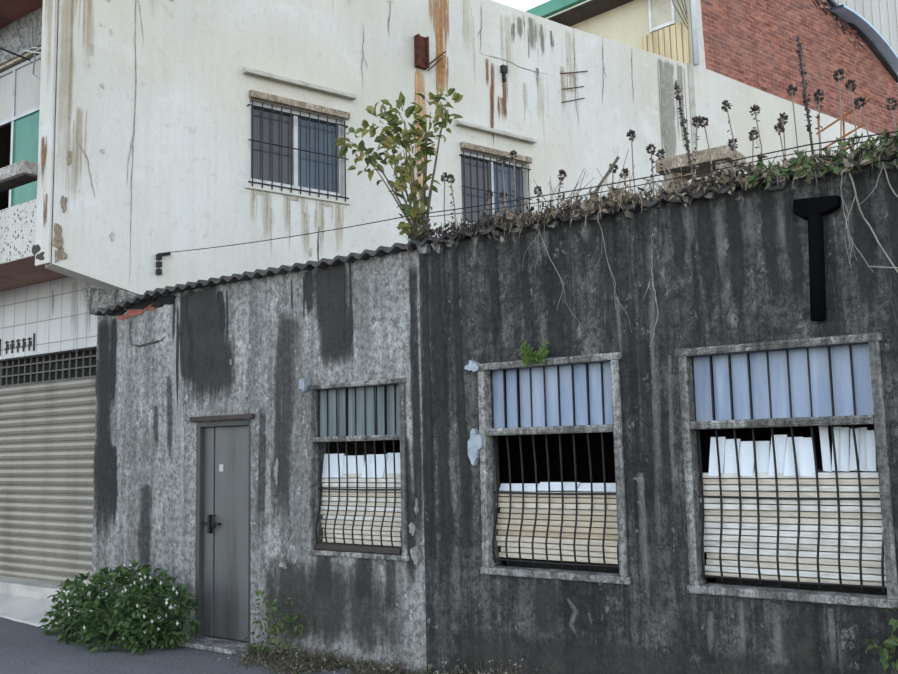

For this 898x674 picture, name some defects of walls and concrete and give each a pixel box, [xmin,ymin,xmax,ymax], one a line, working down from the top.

rust [410,71,426,187]
rust [429,0,449,95]
rust [485,58,508,136]
water stain [489,243,499,325]
water stain [94,318,117,531]
water stain [154,286,232,452]
water stain [258,262,353,510]
water stain [406,253,471,577]
water stain [138,486,150,566]
water stain [266,555,395,651]